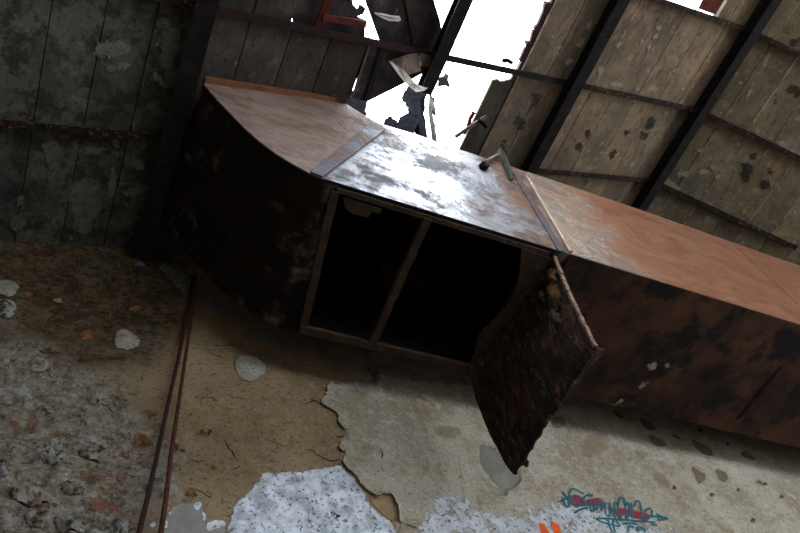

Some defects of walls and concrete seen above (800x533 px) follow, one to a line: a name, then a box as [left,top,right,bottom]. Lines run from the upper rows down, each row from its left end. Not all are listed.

mould [624,116,655,141]
mould [738,152,775,190]
corrosion [538,267,562,328]
flaking render [479,444,522,496]
peeling [414,491,685,533]